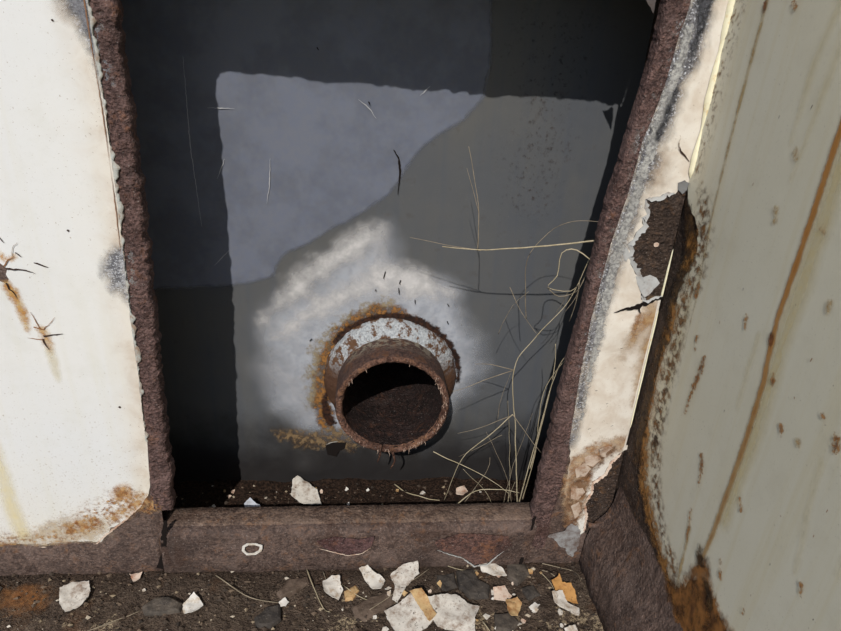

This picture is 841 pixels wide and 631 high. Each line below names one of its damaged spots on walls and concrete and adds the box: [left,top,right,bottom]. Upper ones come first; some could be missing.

water stain [689,0,713,57]
rust [83,0,121,254]
water stain [656,87,679,141]
spalling [0,243,35,327]
peeling [623,180,689,300]
rust [275,299,461,452]
rust [629,121,841,631]
rust [115,487,132,501]
peeling [548,437,626,557]